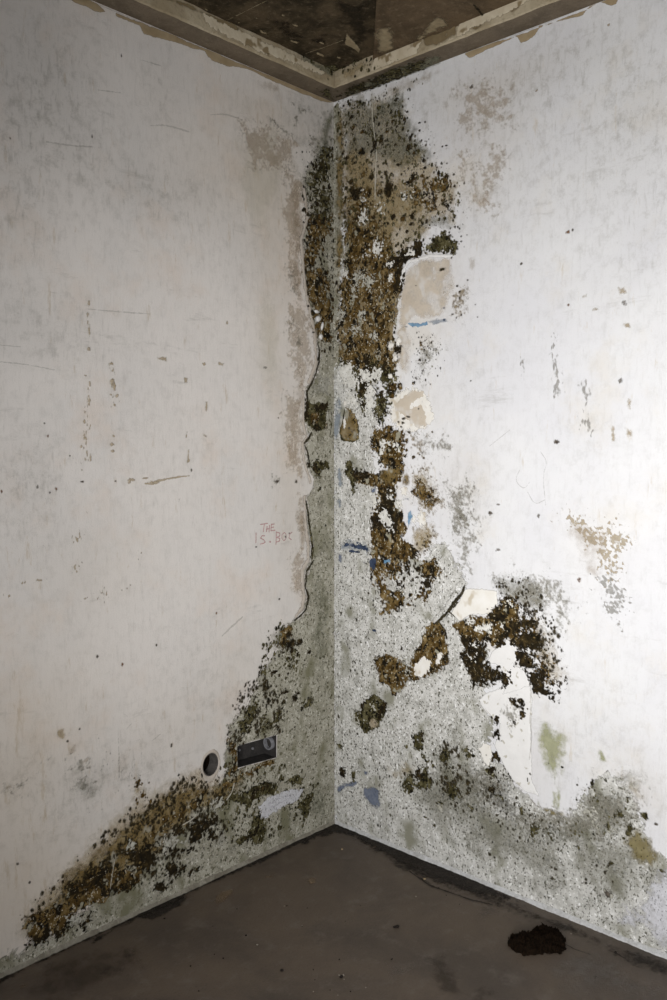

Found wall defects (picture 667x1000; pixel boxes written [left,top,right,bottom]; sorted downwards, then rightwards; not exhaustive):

peeling [72,0,331,102]
peeling [345,34,360,53]
flaking render [370,0,529,72]
peeling [465,0,617,58]
flaking render [303,150,334,313]
mould [296,55,467,620]
mould [452,486,476,574]
flaking render [0,216,667,973]
mould [350,577,568,734]
water stain [21,622,523,963]
water stain [400,730,648,850]